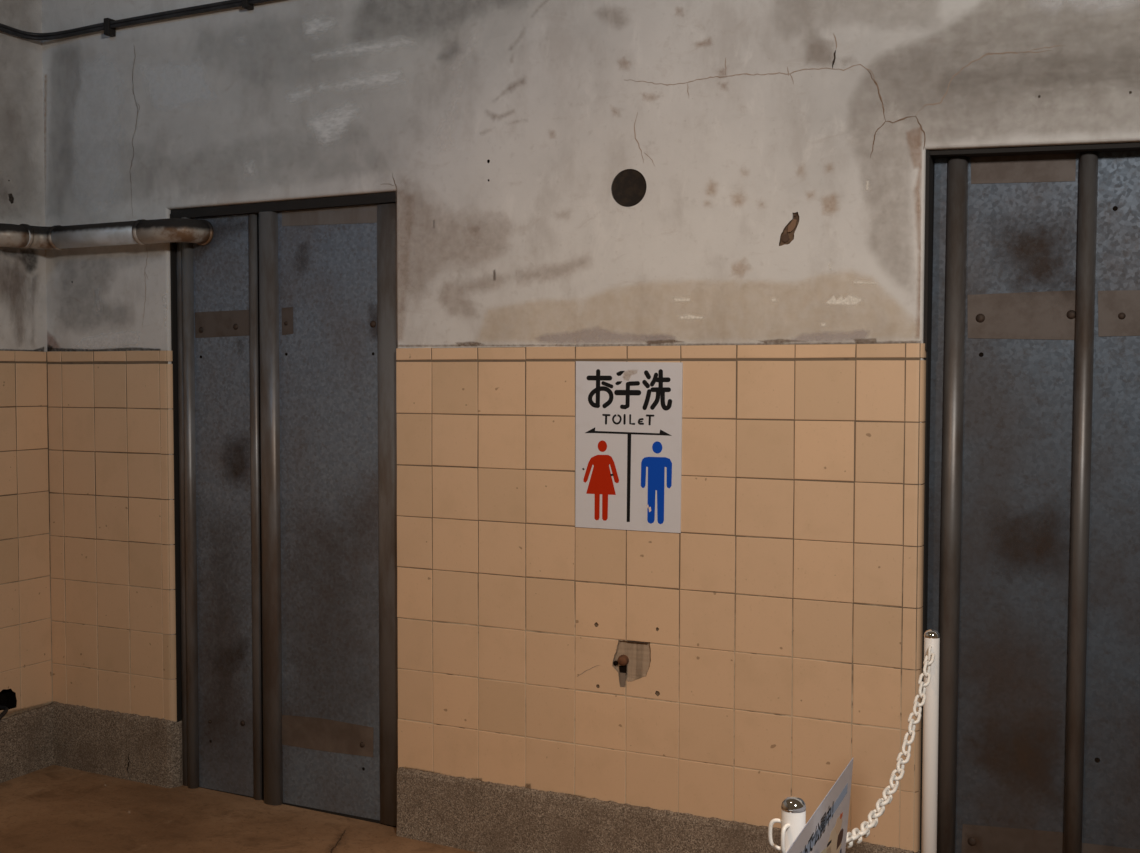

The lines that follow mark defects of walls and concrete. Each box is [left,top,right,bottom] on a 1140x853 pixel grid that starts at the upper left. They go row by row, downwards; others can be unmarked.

crack [630,34,1063,158]
spalling [779,212,799,246]
spalling [612,640,651,687]